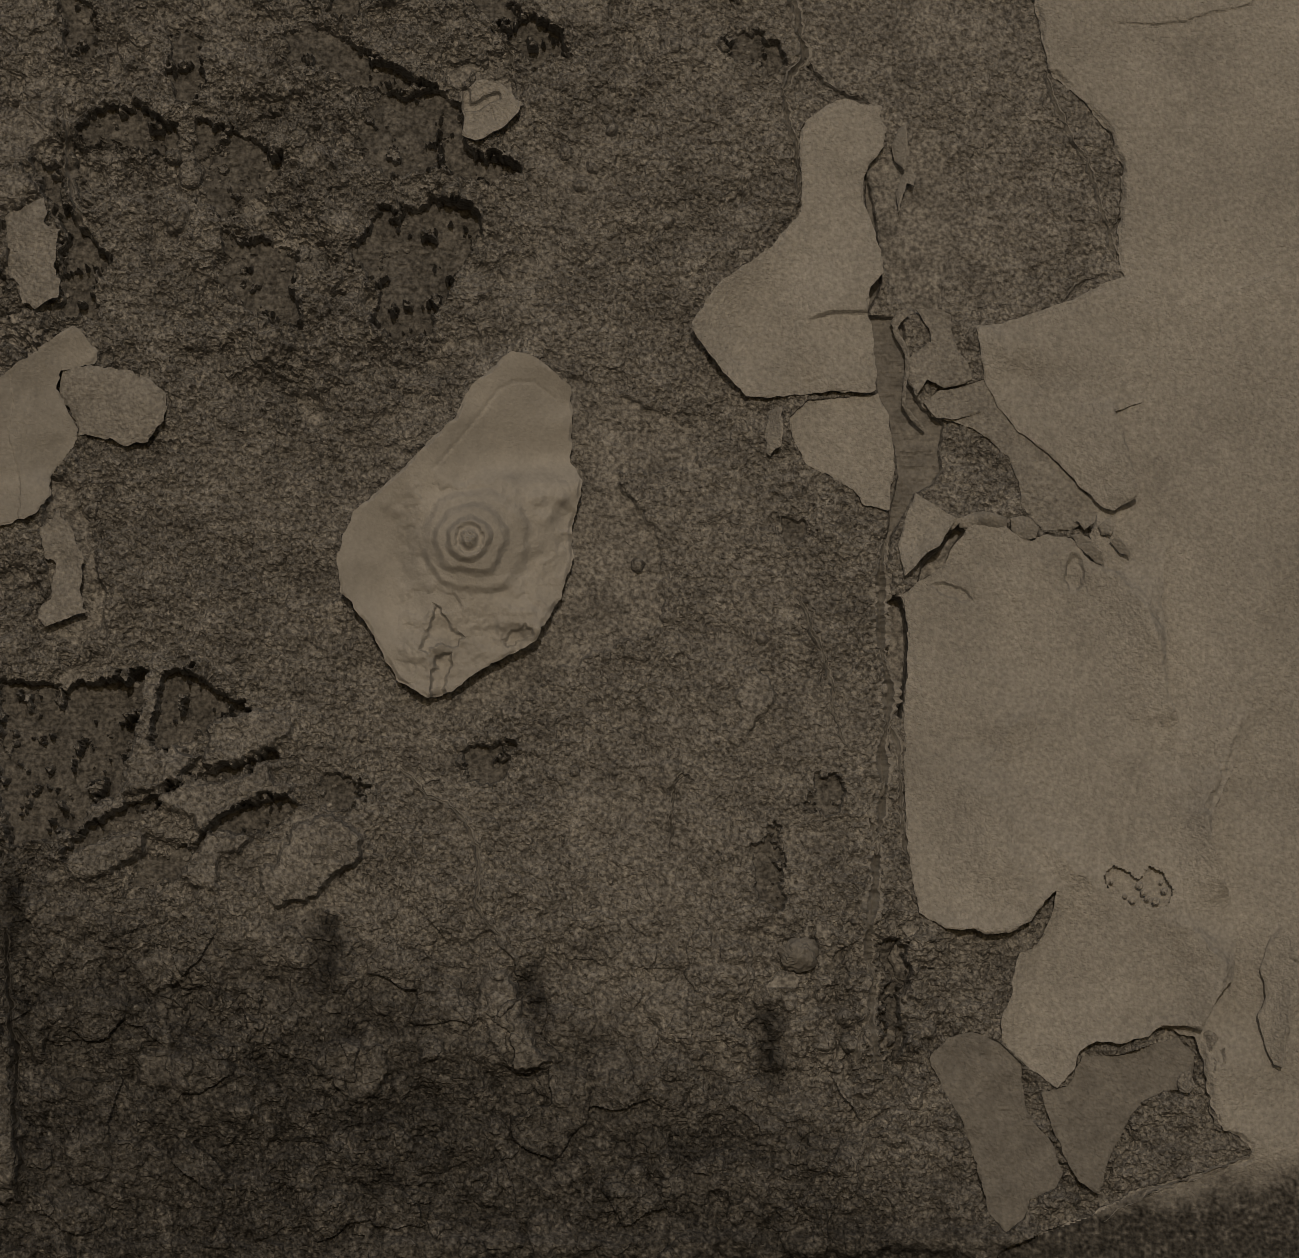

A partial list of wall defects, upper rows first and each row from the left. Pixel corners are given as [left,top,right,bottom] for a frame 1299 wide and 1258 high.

spalling [730,32,783,75]
crack [1120,0,1257,28]
peeling [0,161,167,627]
peeling [691,99,1162,575]
crack [852,539,908,1074]
peeling [930,1030,1226,1232]